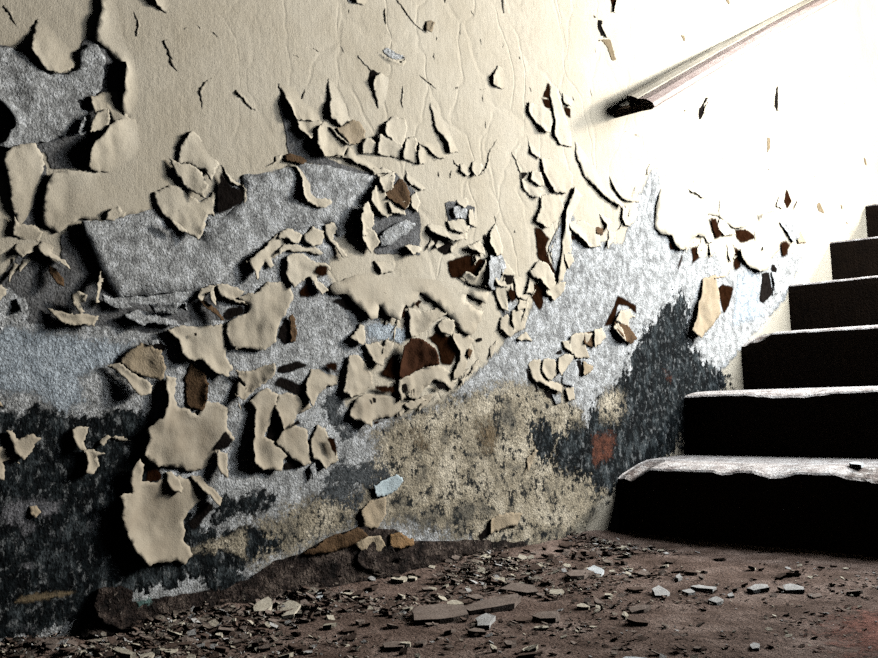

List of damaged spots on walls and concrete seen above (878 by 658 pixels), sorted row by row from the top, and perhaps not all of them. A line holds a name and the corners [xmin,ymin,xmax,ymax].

crack [341,0,438,85]
crack [460,11,521,90]
crack [530,83,592,100]
crack [594,0,618,60]
flaking render [0,0,806,566]
mould [520,288,735,508]
leakage [0,322,285,642]
leakage [319,392,398,512]
flaking render [0,610,96,645]
flaking render [132,569,210,602]